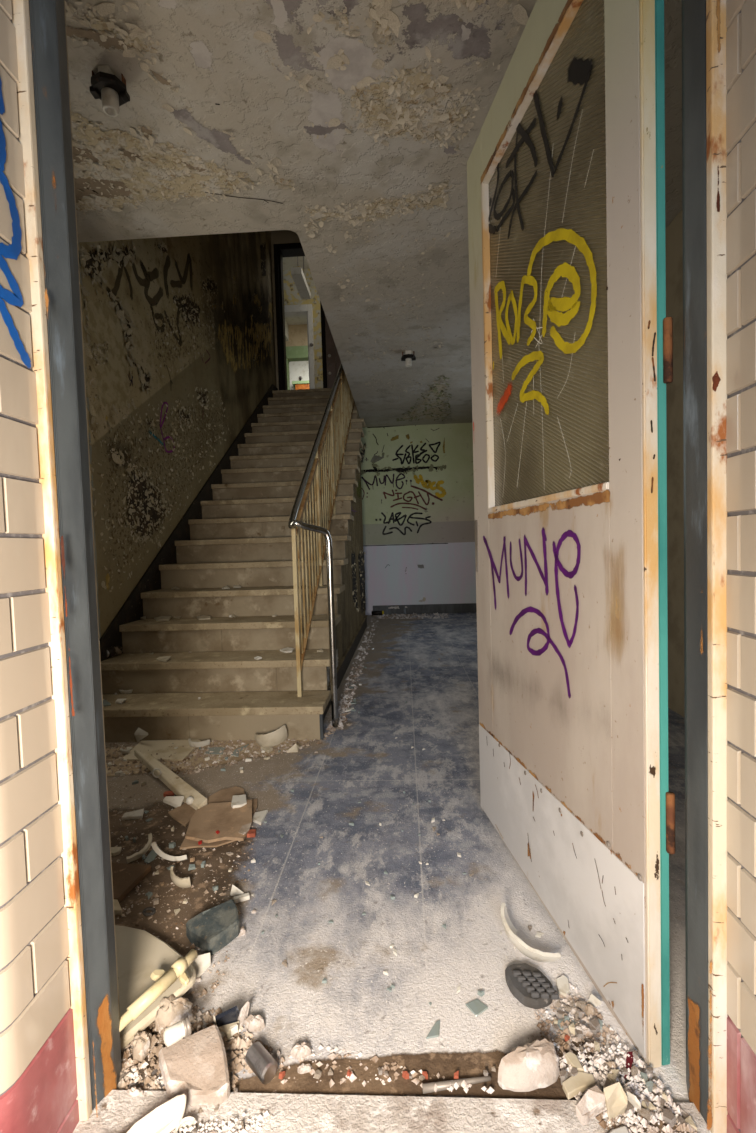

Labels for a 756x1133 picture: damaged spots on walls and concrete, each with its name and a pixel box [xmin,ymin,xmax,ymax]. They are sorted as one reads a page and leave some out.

peeling [65,0,264,217]
peeling [241,0,529,160]
corrosion [712,371,721,392]
corrosion [93,995,117,1117]